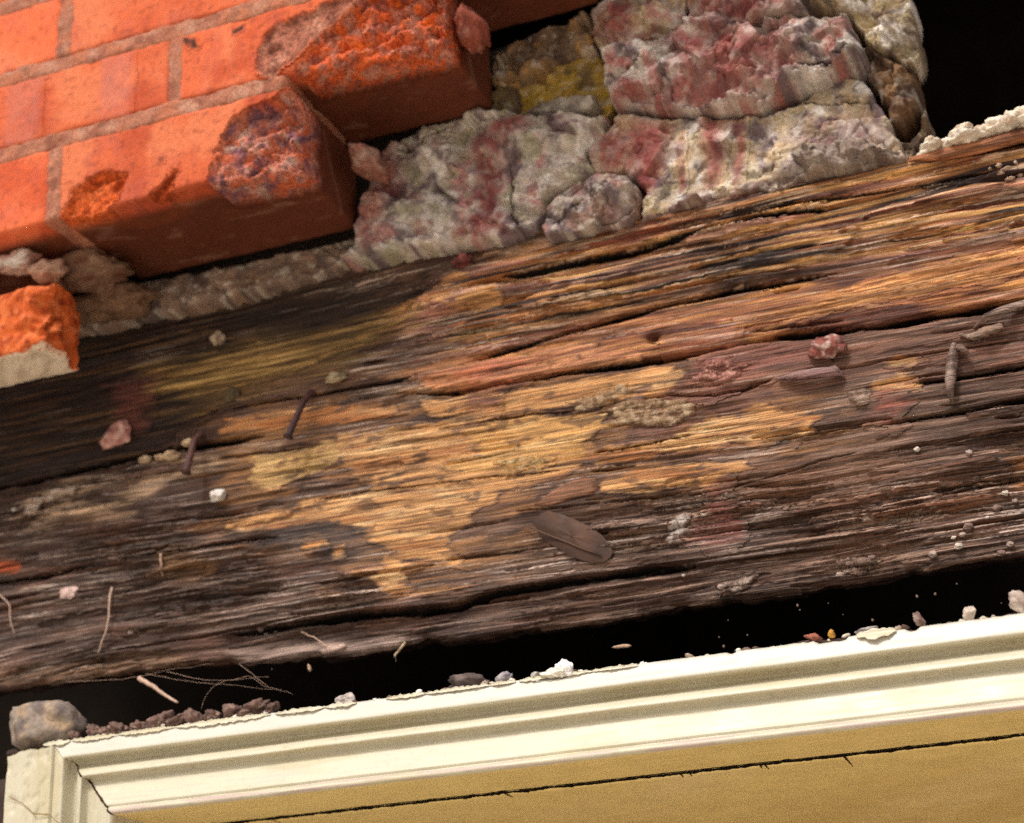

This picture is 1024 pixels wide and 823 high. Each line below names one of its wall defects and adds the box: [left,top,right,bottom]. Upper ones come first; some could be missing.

spalling [205,0,464,209]
spalling [60,168,128,228]
crack [225,562,709,637]
crack [226,734,1024,823]